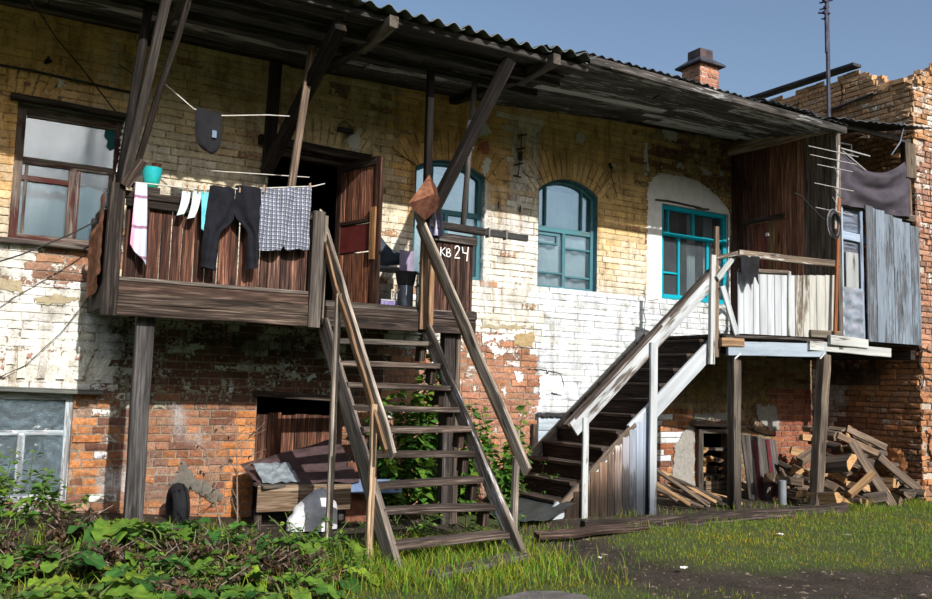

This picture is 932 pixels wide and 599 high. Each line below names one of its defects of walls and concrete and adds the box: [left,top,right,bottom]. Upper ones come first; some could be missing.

peeling [0,278,23,293]
peeling [33,280,88,306]
peeling [479,323,535,355]
peeling [756,404,780,431]